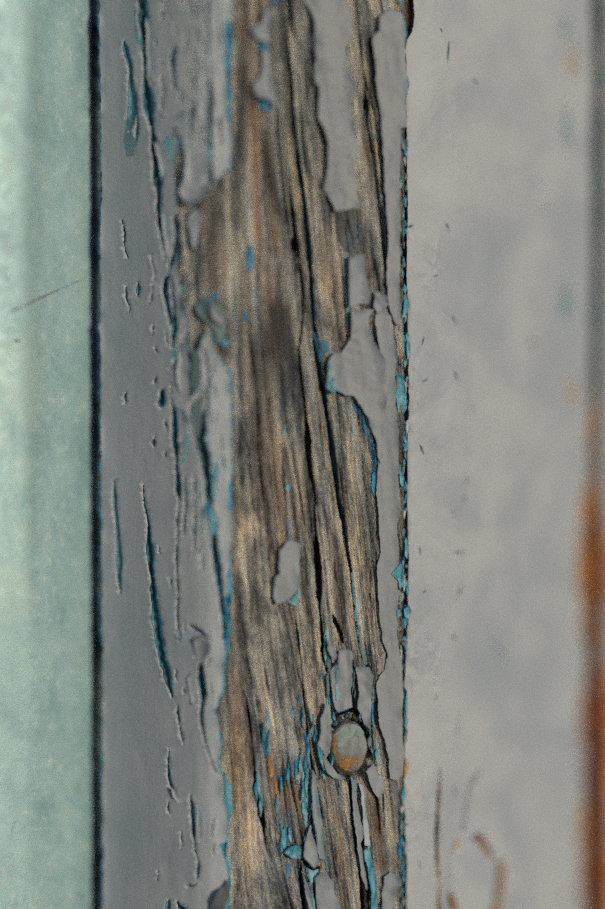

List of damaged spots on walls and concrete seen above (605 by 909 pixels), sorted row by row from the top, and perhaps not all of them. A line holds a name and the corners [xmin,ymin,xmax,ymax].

peeling [135,10,154,93]
crack [123,0,225,909]
peeling [165,333,218,464]
peeling [251,0,411,909]
crack [287,0,376,826]
crack [356,0,411,741]
peeling [175,523,233,705]
corrosion [579,400,605,909]
peeling [210,720,234,909]
crack [245,694,266,845]
crack [299,858,320,909]
crack [347,775,407,909]